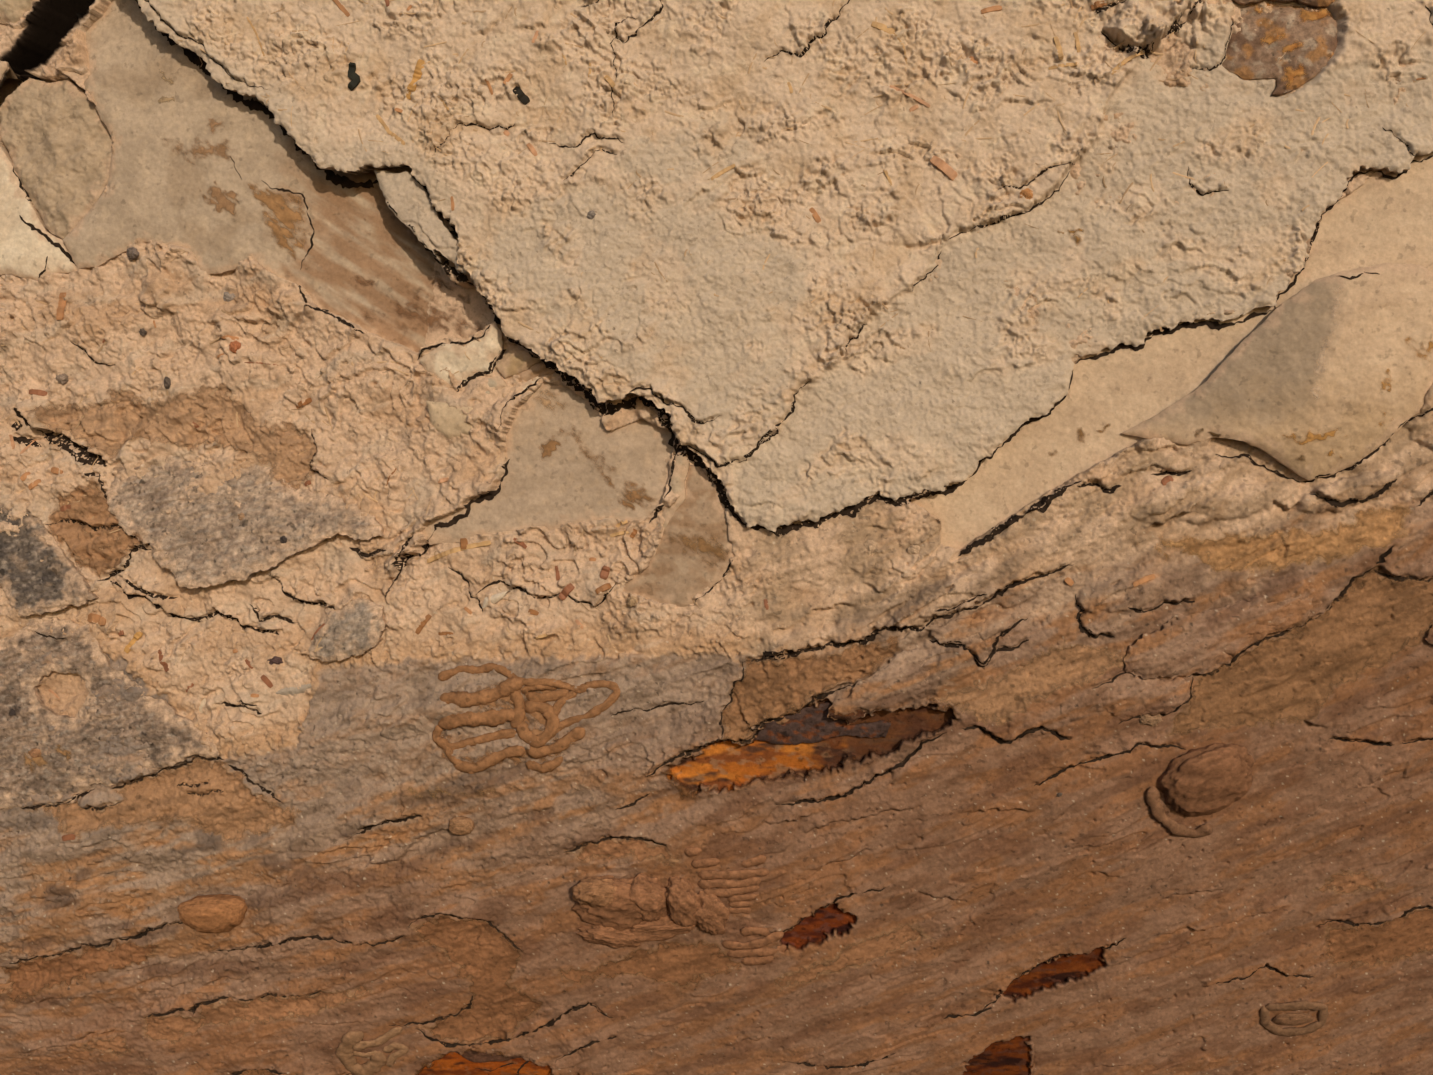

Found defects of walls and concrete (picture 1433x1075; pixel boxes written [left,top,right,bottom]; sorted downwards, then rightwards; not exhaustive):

corrosion [1300,9,1329,22]
crack [135,0,1433,556]
peeling [138,0,1433,532]
peeling [0,384,387,840]
crack [349,459,616,612]
crack [565,560,1195,852]
crack [776,545,1433,806]
crack [22,755,281,811]
crack [212,913,523,952]
hole [416,1046,553,1075]
crack [388,996,616,1075]
hole [963,1036,1033,1075]